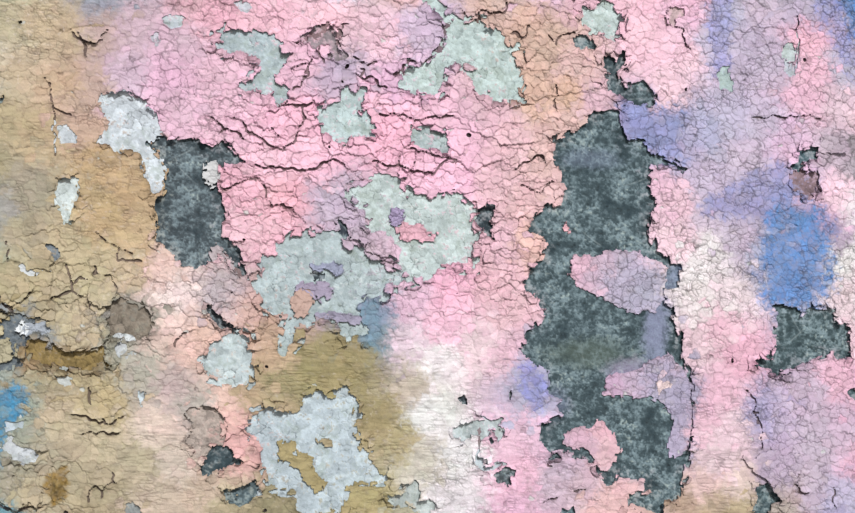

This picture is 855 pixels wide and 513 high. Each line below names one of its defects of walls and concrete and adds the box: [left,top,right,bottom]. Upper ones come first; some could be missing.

crack [70,29,108,57]
crack [209,2,580,222]
crack [752,113,820,121]
peeling [46,0,537,390]
crack [0,233,142,314]
spalling [515,0,707,513]
spalling [747,298,855,384]
crack [71,387,124,435]
peeling [180,374,446,513]
peeling [448,395,516,487]
crack [0,504,43,512]
peeling [125,502,142,513]